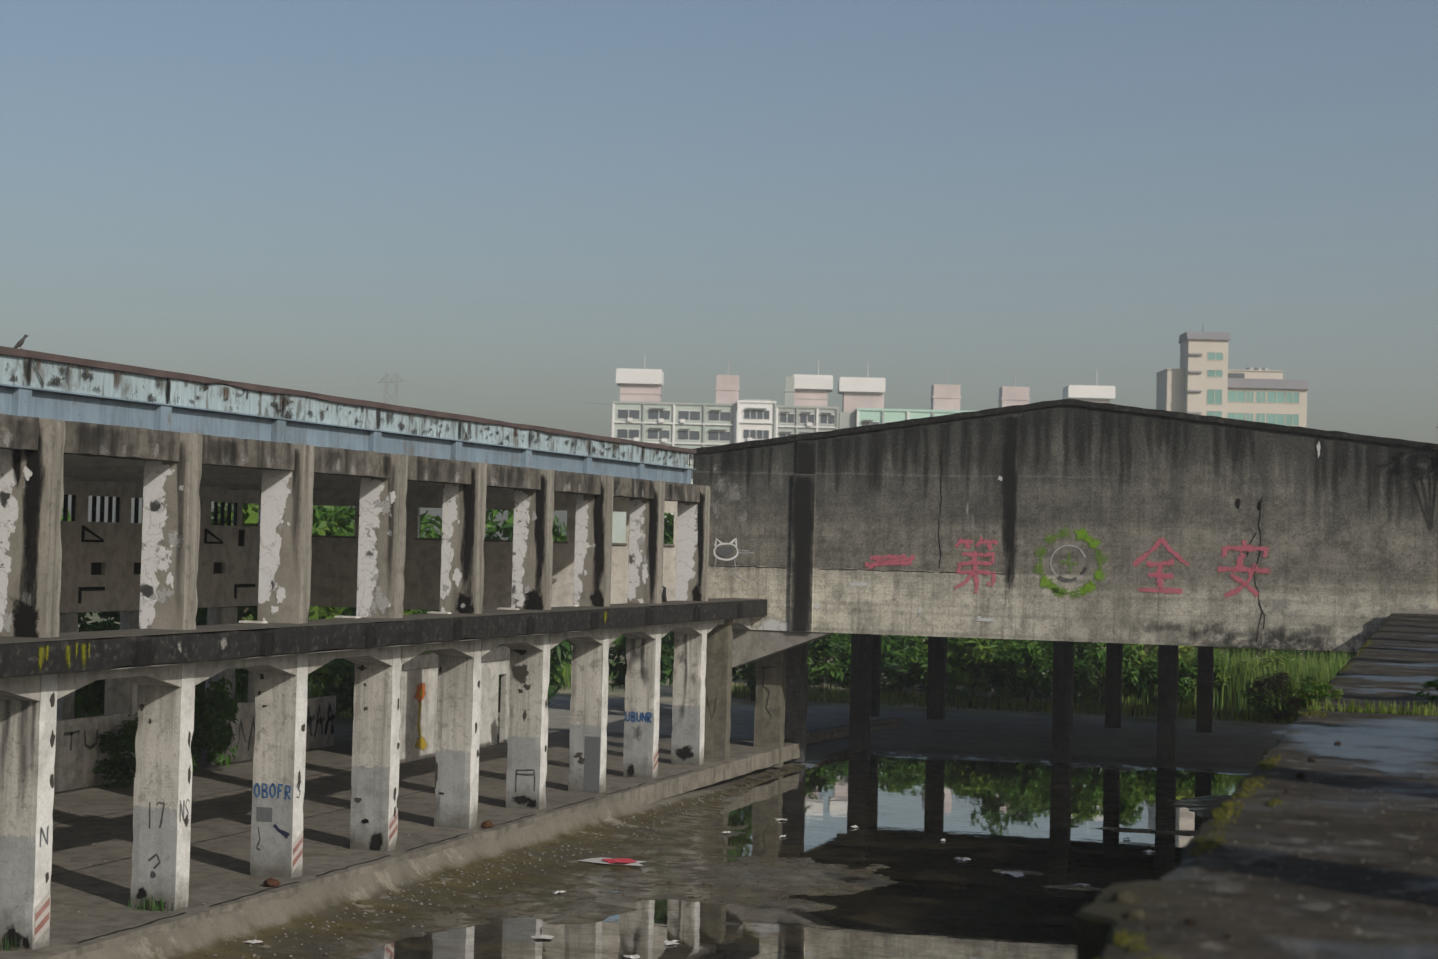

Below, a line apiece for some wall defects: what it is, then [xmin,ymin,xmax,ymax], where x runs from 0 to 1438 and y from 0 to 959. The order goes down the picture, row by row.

peeling [0,449,33,633]
peeling [31,360,100,392]
peeling [139,461,184,629]
peeling [258,470,293,621]
peeling [271,397,363,423]
peeling [356,477,396,617]
peeling [440,484,465,612]
peeling [381,414,575,453]
peeling [511,490,537,608]
water stain [1003,417,1019,589]
crack [1247,496,1265,642]